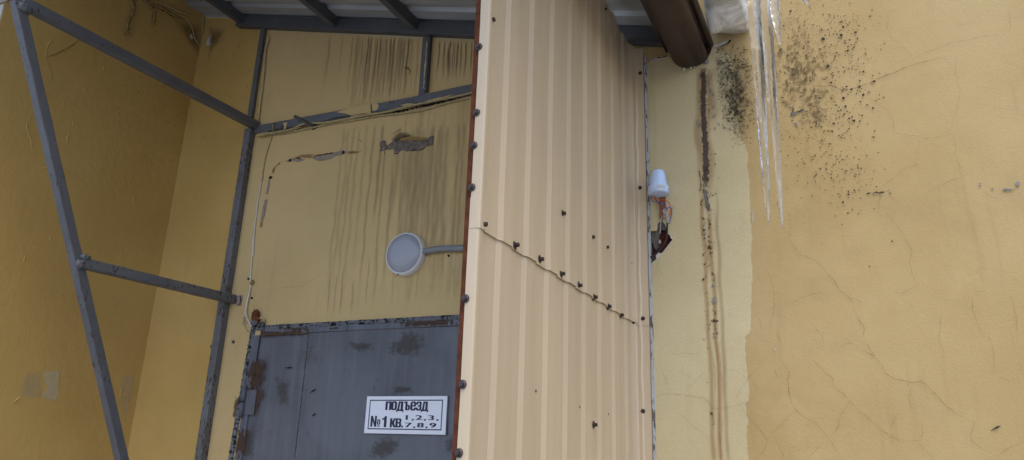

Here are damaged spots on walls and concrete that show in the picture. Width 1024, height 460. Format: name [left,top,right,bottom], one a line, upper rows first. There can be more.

spalling [380,129,434,155]
water stain [716,44,755,147]
water stain [771,0,893,216]
corrosion [697,68,719,349]
corrosion [259,327,309,337]
crack [658,226,1022,460]
corrosion [233,359,266,459]